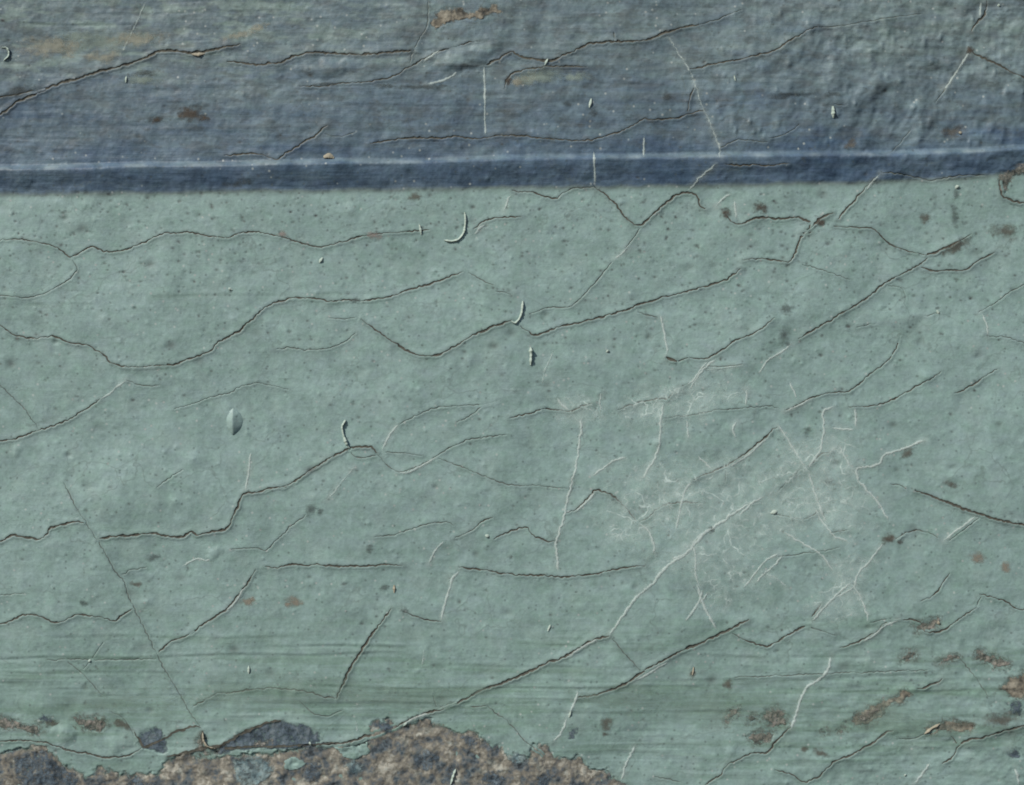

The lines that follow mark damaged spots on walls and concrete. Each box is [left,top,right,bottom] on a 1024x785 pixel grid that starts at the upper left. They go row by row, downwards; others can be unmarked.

crack [0,0,922,162]
peeling [431,4,502,28]
crack [933,0,1024,104]
crack [0,160,1024,785]
peeling [0,716,626,785]